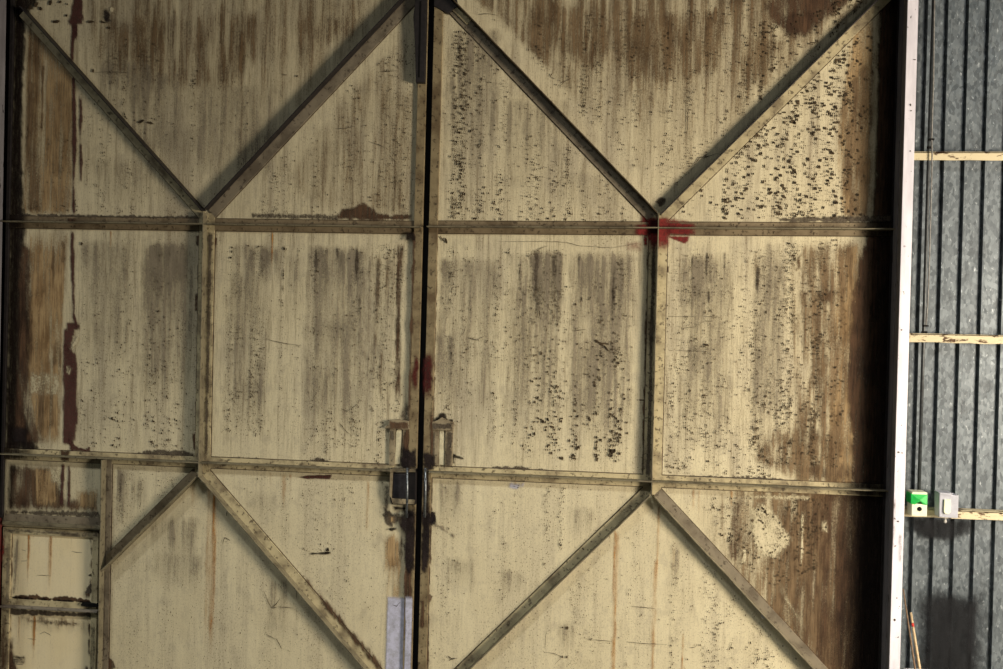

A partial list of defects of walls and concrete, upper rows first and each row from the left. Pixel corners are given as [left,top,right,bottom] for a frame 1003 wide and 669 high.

corrosion [481,0,857,122]
corrosion [252,95,410,221]
corrosion [4,0,112,534]
damp [236,246,278,299]
damp [294,248,381,409]
corrosion [375,232,415,450]
damp [516,251,634,424]
corrosion [721,0,898,669]